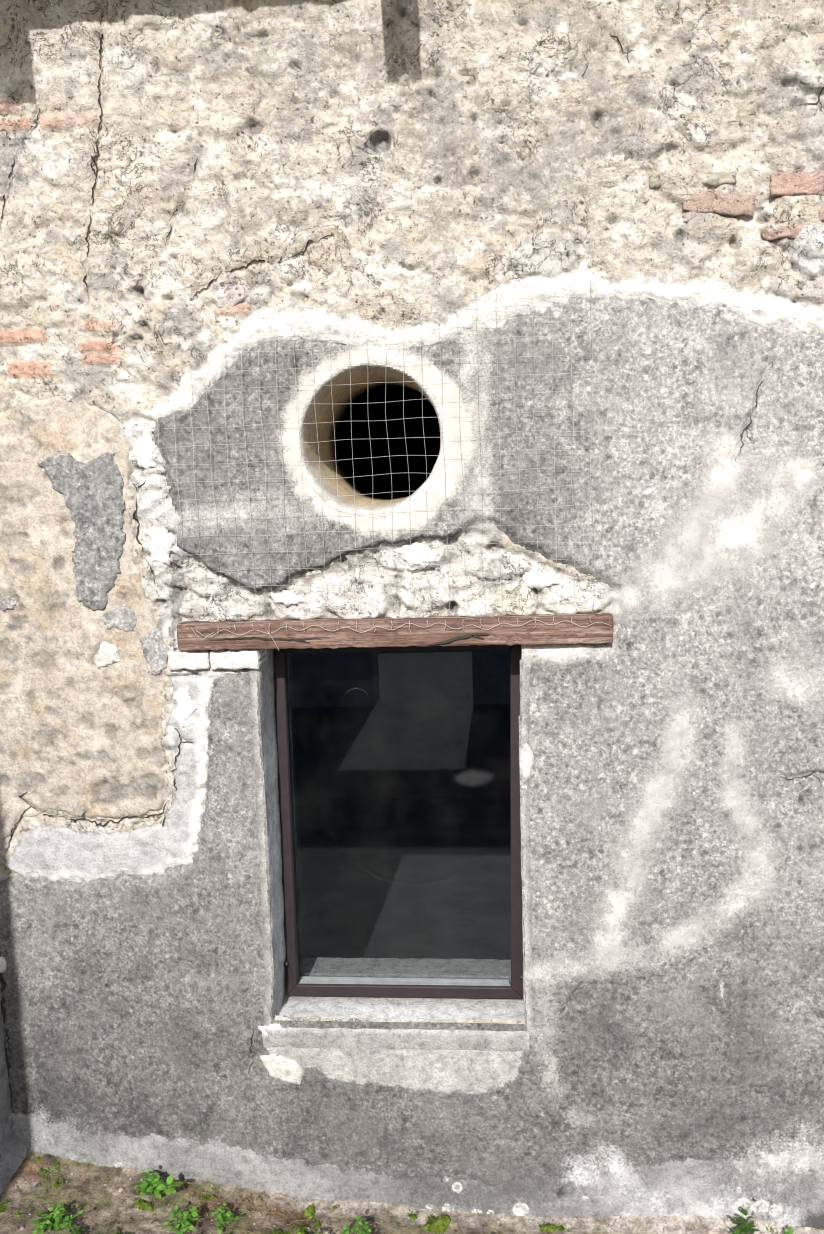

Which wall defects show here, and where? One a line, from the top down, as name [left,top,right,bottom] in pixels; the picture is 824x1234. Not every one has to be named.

crack [1,108,40,218]
crack [83,1,104,290]
crack [190,233,334,299]
crack [735,365,773,461]
leakage [602,429,822,618]
spalling [0,396,615,851]
leakage [521,640,615,665]
leakage [764,653,824,706]
crack [5,728,193,851]
leakage [524,694,775,1093]
leakage [431,1146,739,1218]
leakage [765,1207,824,1230]